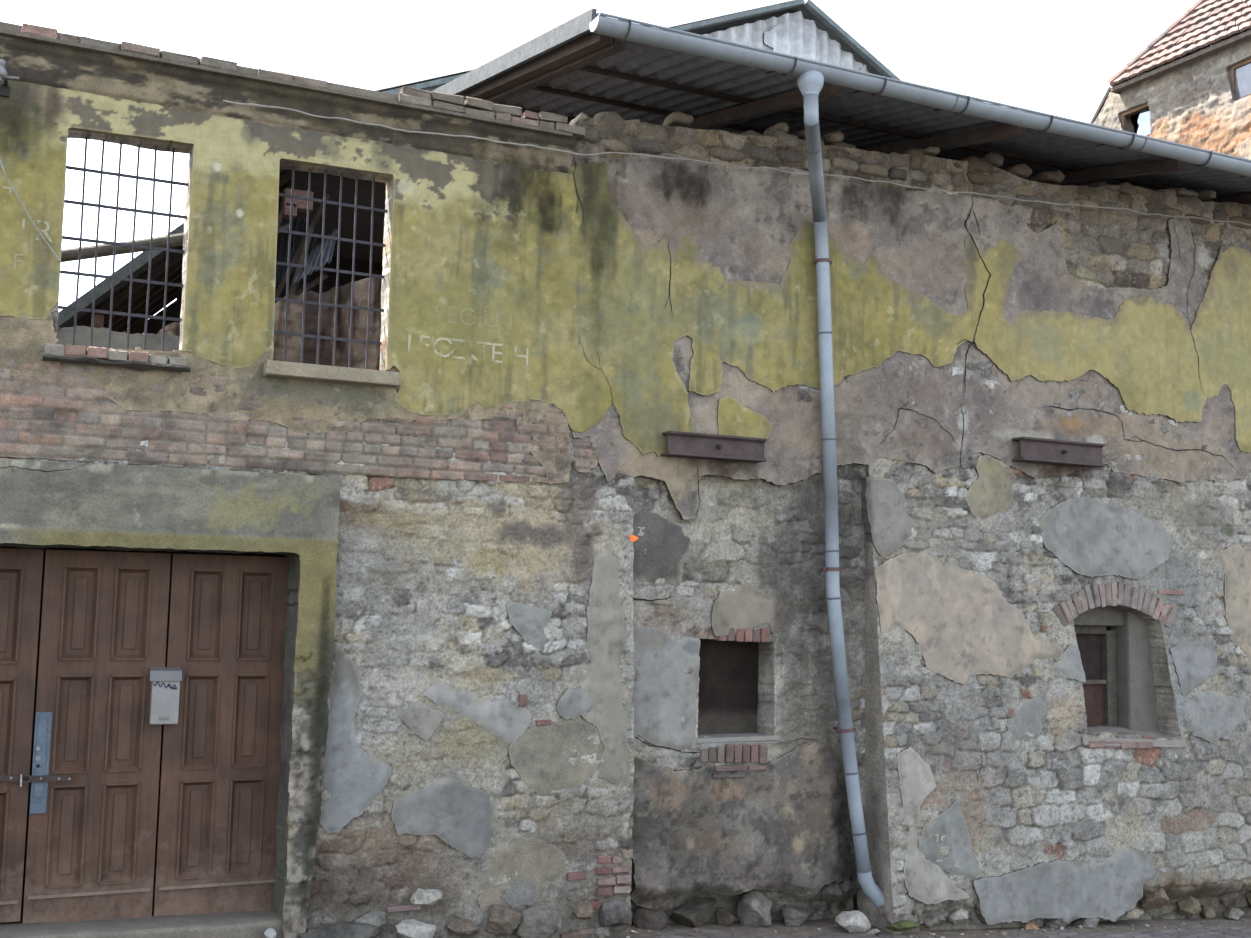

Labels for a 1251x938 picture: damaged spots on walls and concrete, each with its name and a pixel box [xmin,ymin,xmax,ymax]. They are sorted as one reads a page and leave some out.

spalling [0,309,1251,520]
spalling [587,153,1251,330]
crack [878,196,991,469]
crack [1173,220,1205,395]
spalling [566,855,631,909]